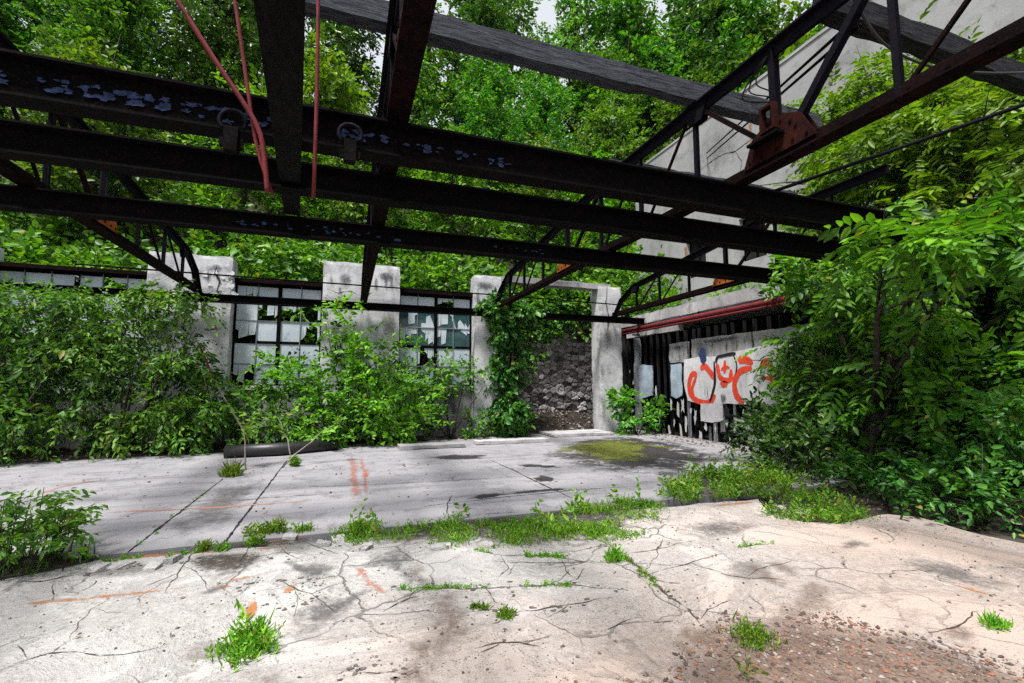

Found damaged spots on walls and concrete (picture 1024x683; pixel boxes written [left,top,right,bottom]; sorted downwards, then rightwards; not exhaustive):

peeling [36,77,271,127]
peeling [341,129,388,143]
peeling [404,143,511,167]
leakage [515,437,718,493]
crack [9,575,169,664]
crack [149,538,340,618]
crack [384,539,790,652]
crack [934,611,978,632]